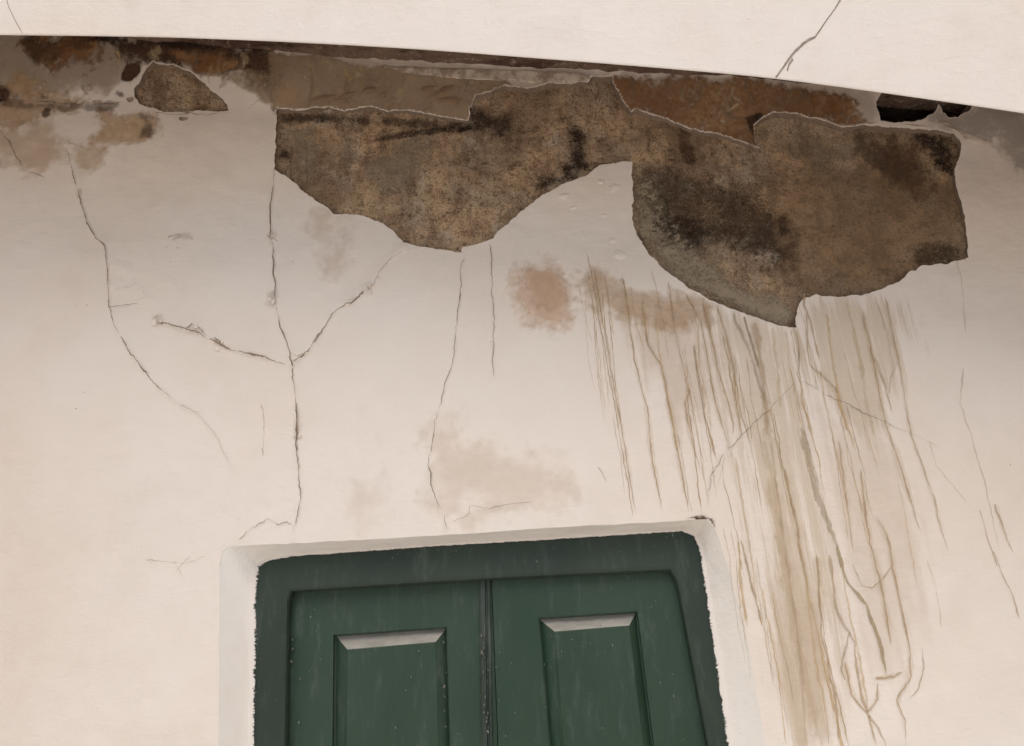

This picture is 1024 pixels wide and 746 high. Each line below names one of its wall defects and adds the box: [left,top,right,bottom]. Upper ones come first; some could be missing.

spalling [81,57,229,121]
crack [775,0,840,78]
spalling [276,66,966,327]
crack [67,144,372,539]
crack [428,261,463,527]
leakage [609,375,631,503]
leakage [682,323,761,504]
leakage [736,541,787,685]
leakage [774,416,921,746]